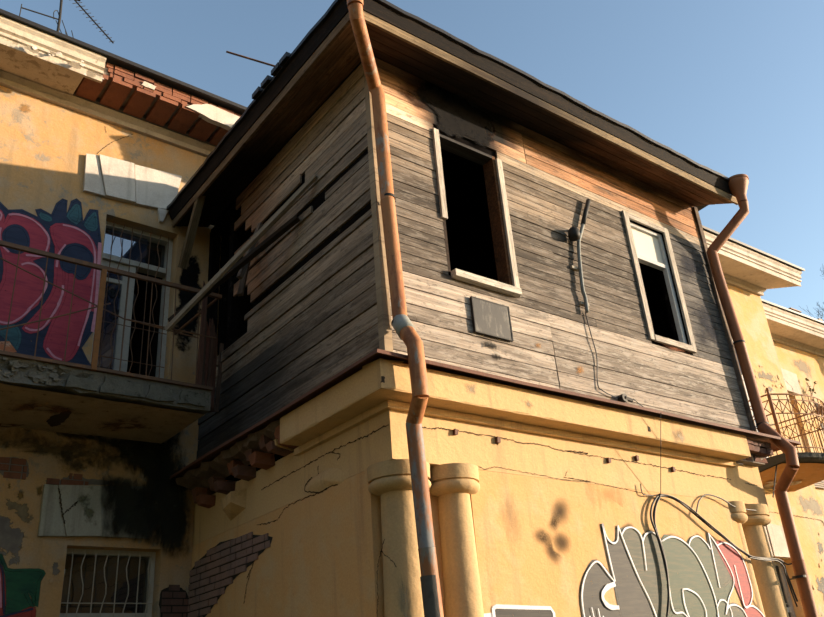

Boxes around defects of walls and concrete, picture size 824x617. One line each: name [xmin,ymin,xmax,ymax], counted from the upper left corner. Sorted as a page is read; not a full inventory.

peeling [754,365,785,393]
spalling [0,457,29,480]
crack [58,488,78,524]
damp [0,430,189,556]
crack [258,424,389,525]
crack [479,466,646,494]
crack [422,427,757,486]
peeling [799,496,824,515]
peeling [0,491,40,566]
damp [539,533,566,557]
peeling [813,532,824,599]